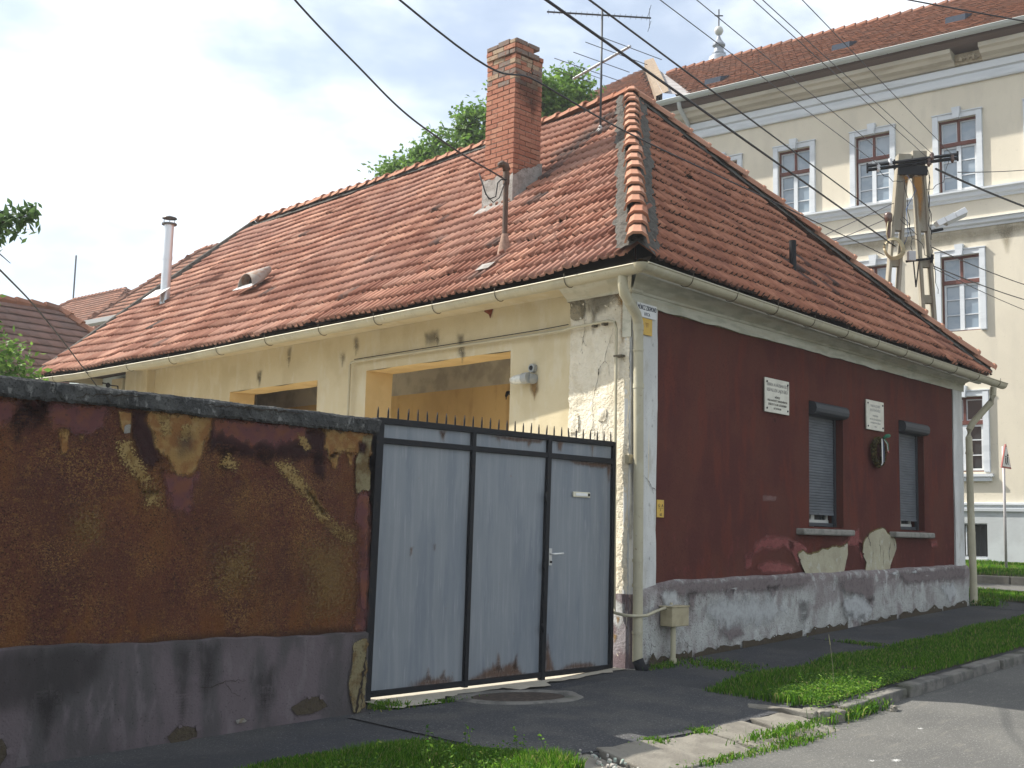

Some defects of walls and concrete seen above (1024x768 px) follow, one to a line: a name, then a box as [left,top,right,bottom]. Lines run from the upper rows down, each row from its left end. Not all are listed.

leakage [114,411,200,514]
leakage [209,420,359,546]
spalling [146,411,373,713]
efflorescence [663,592,678,605]
leakage [709,594,781,628]
peeling [663,527,967,626]
efflorescence [844,595,872,620]